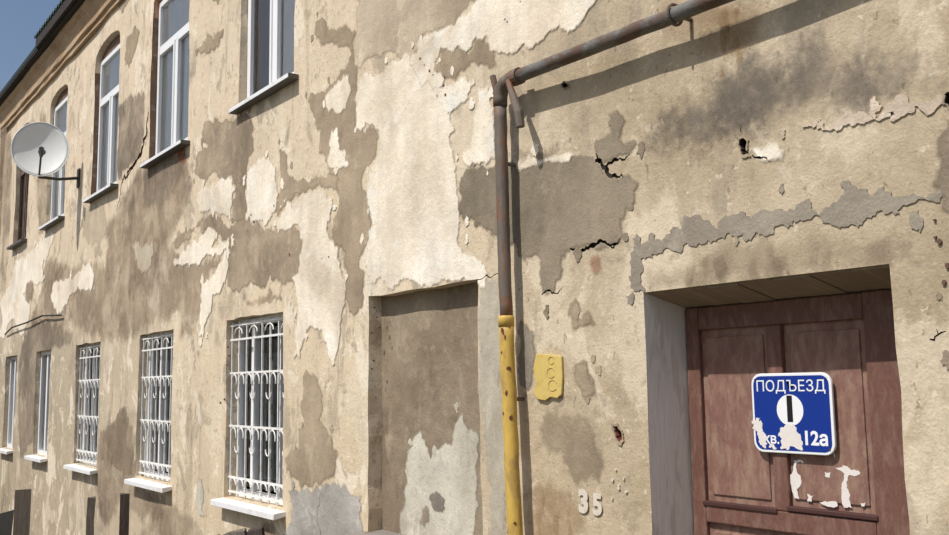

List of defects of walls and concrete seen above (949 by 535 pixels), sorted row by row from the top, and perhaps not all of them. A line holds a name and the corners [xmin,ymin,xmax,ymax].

peeling [869,96,883,119]
crack [116,111,149,211]
crack [595,153,630,178]
peeling [81,205,106,243]
flaking render [508,110,949,320]
peeling [133,241,154,273]
peeling [173,0,603,535]
crack [570,238,621,252]
flaking render [941,350,949,370]